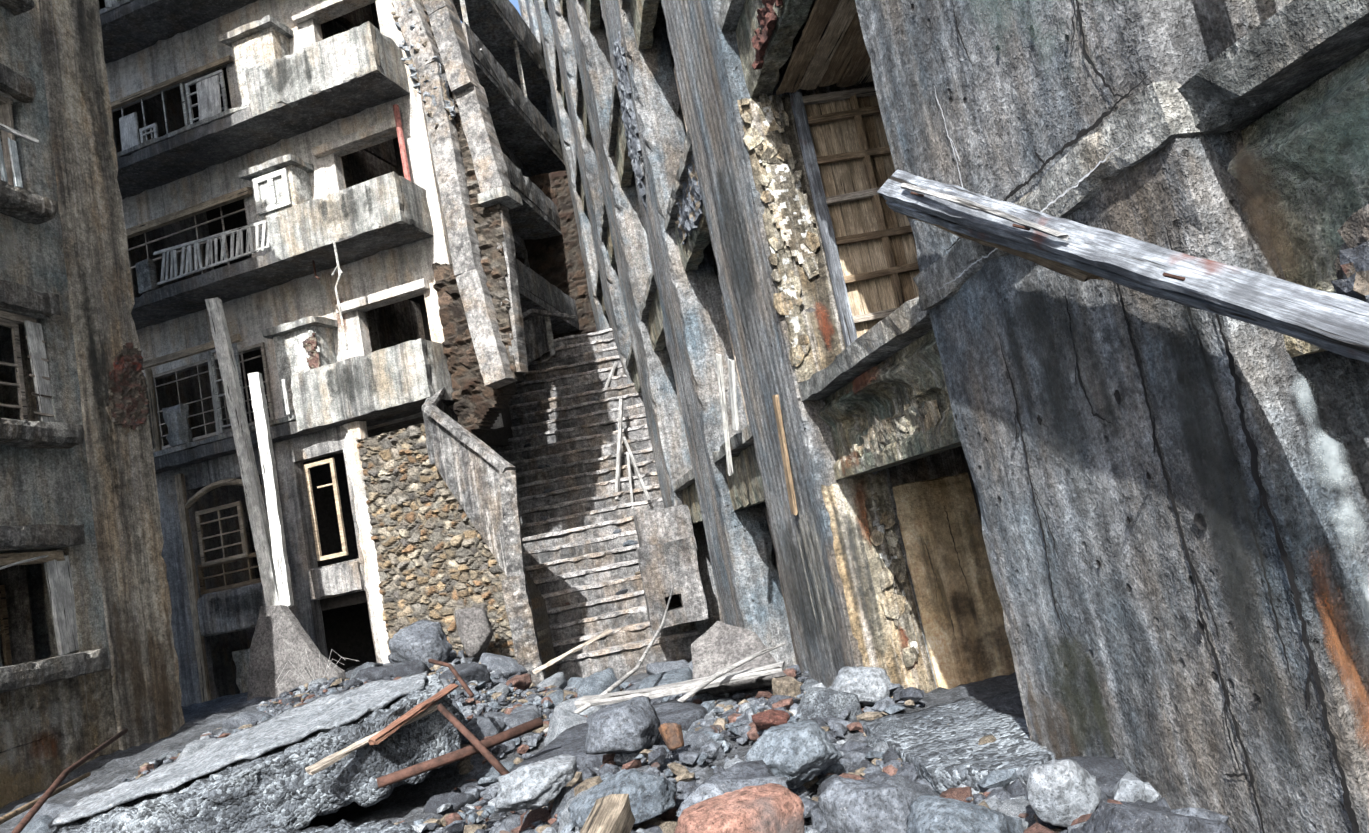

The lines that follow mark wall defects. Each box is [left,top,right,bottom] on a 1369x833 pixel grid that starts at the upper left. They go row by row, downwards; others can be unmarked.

spalling [751,0,783,70]
crack [934,86,963,188]
crack [1003,0,1148,212]
peeling [740,94,820,367]
crack [938,237,997,290]
spalling [1331,204,1369,303]
spalling [105,343,150,435]
crack [1116,283,1265,833]
crack [1187,309,1359,833]
rust [1313,554,1369,730]